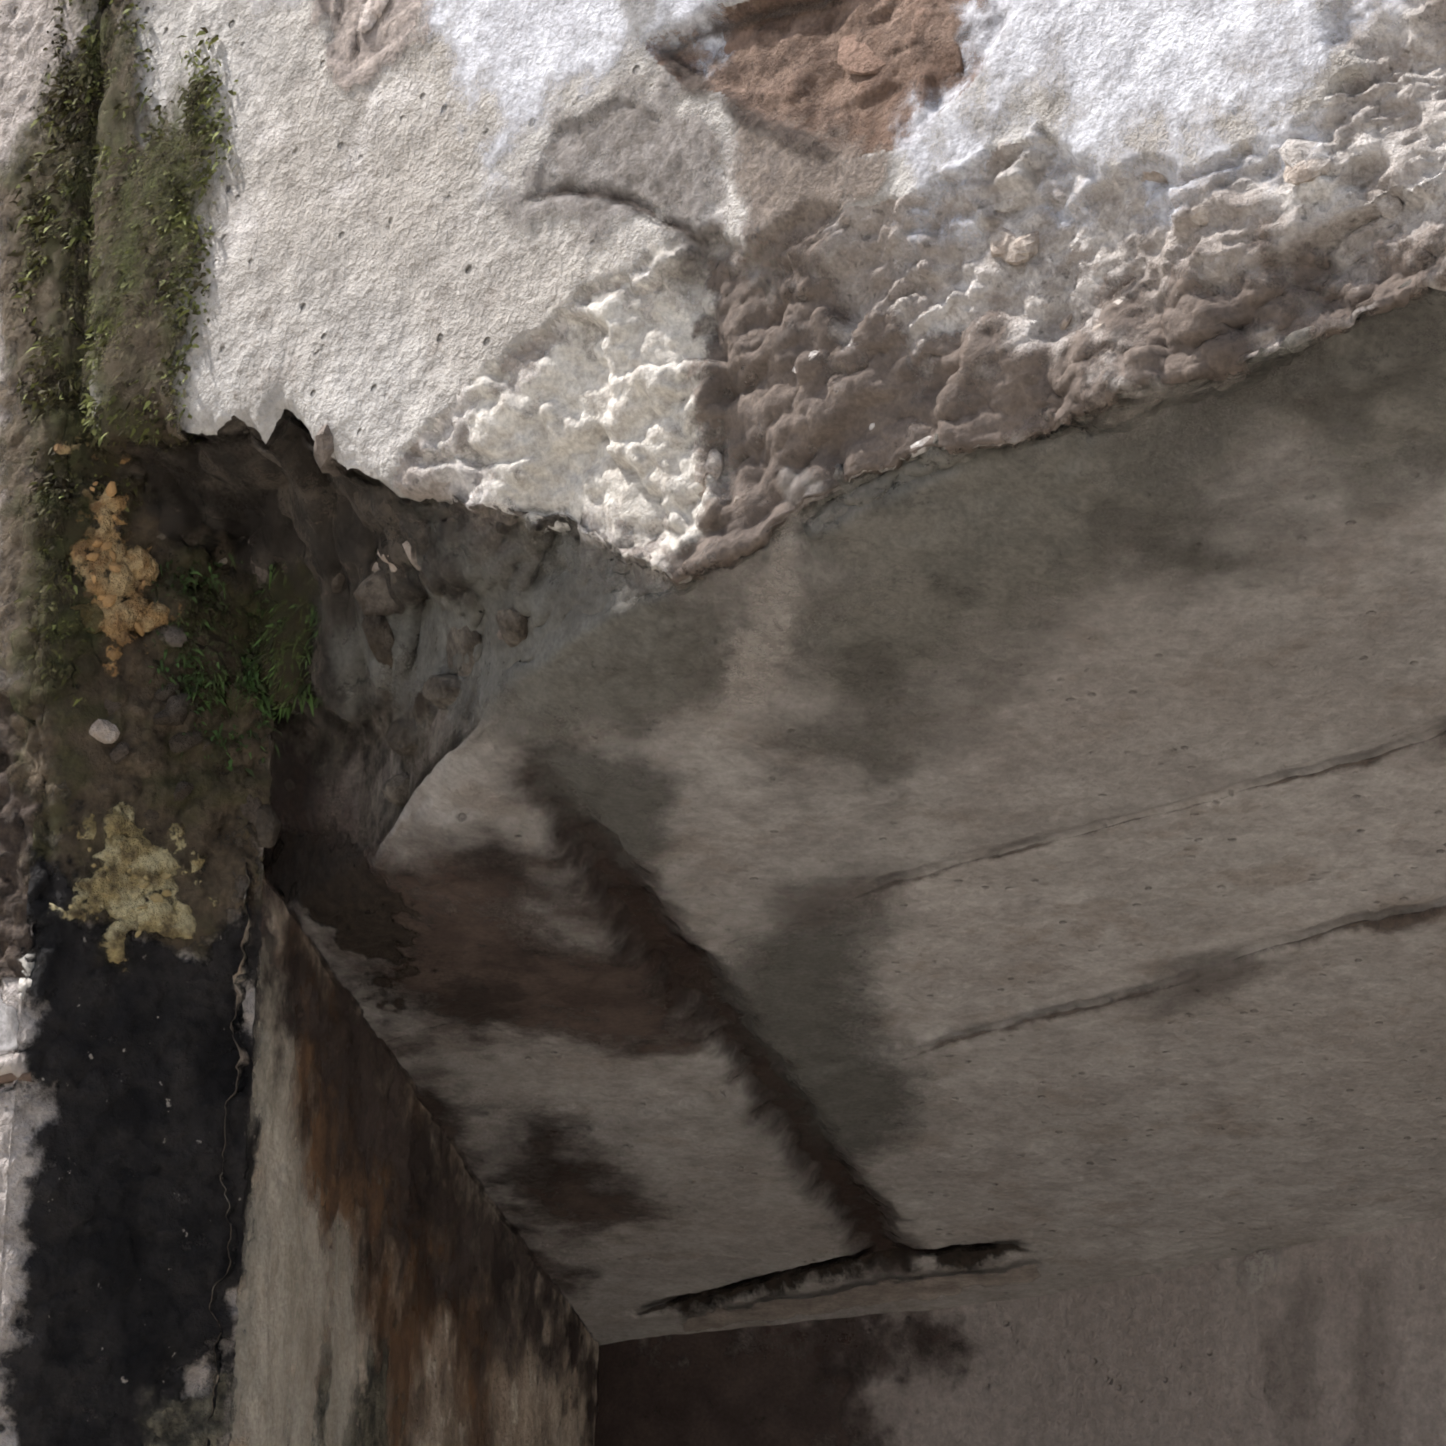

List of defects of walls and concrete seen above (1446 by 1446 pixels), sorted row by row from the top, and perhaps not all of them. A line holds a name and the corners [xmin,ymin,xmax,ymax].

crack [86,0,120,162]
crack [65,196,96,401]
spalling [115,0,1446,904]
spalling [89,699,131,764]
crack [1248,732,1446,789]
crack [1260,905,1446,951]
crack [0,1050,28,1091]
leakage [0,848,423,1446]
crack [518,751,1201,1332]
leakage [544,1292,970,1446]